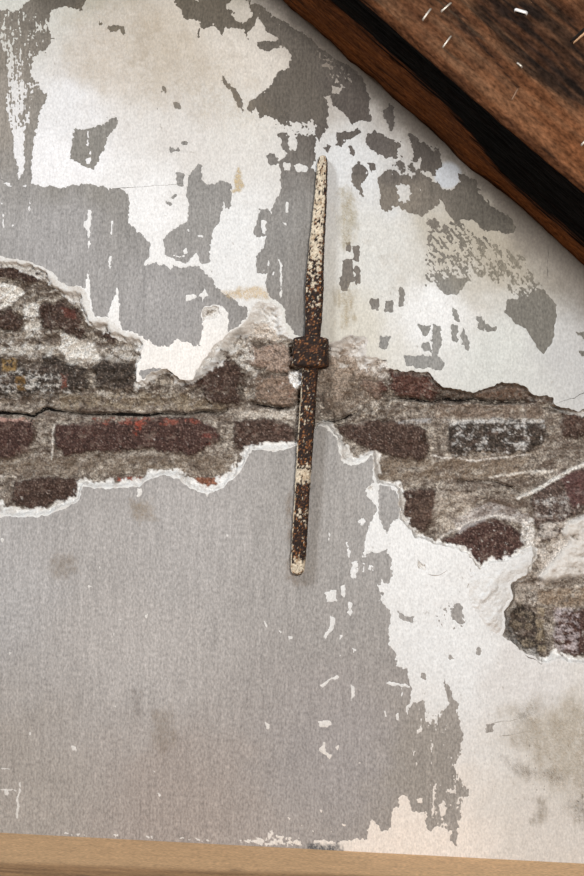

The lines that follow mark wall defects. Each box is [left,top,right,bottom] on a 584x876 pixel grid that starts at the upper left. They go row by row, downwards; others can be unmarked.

crack [0,398,219,426]
peeling [0,0,371,518]
peeling [311,36,584,864]
peeling [1,782,21,819]